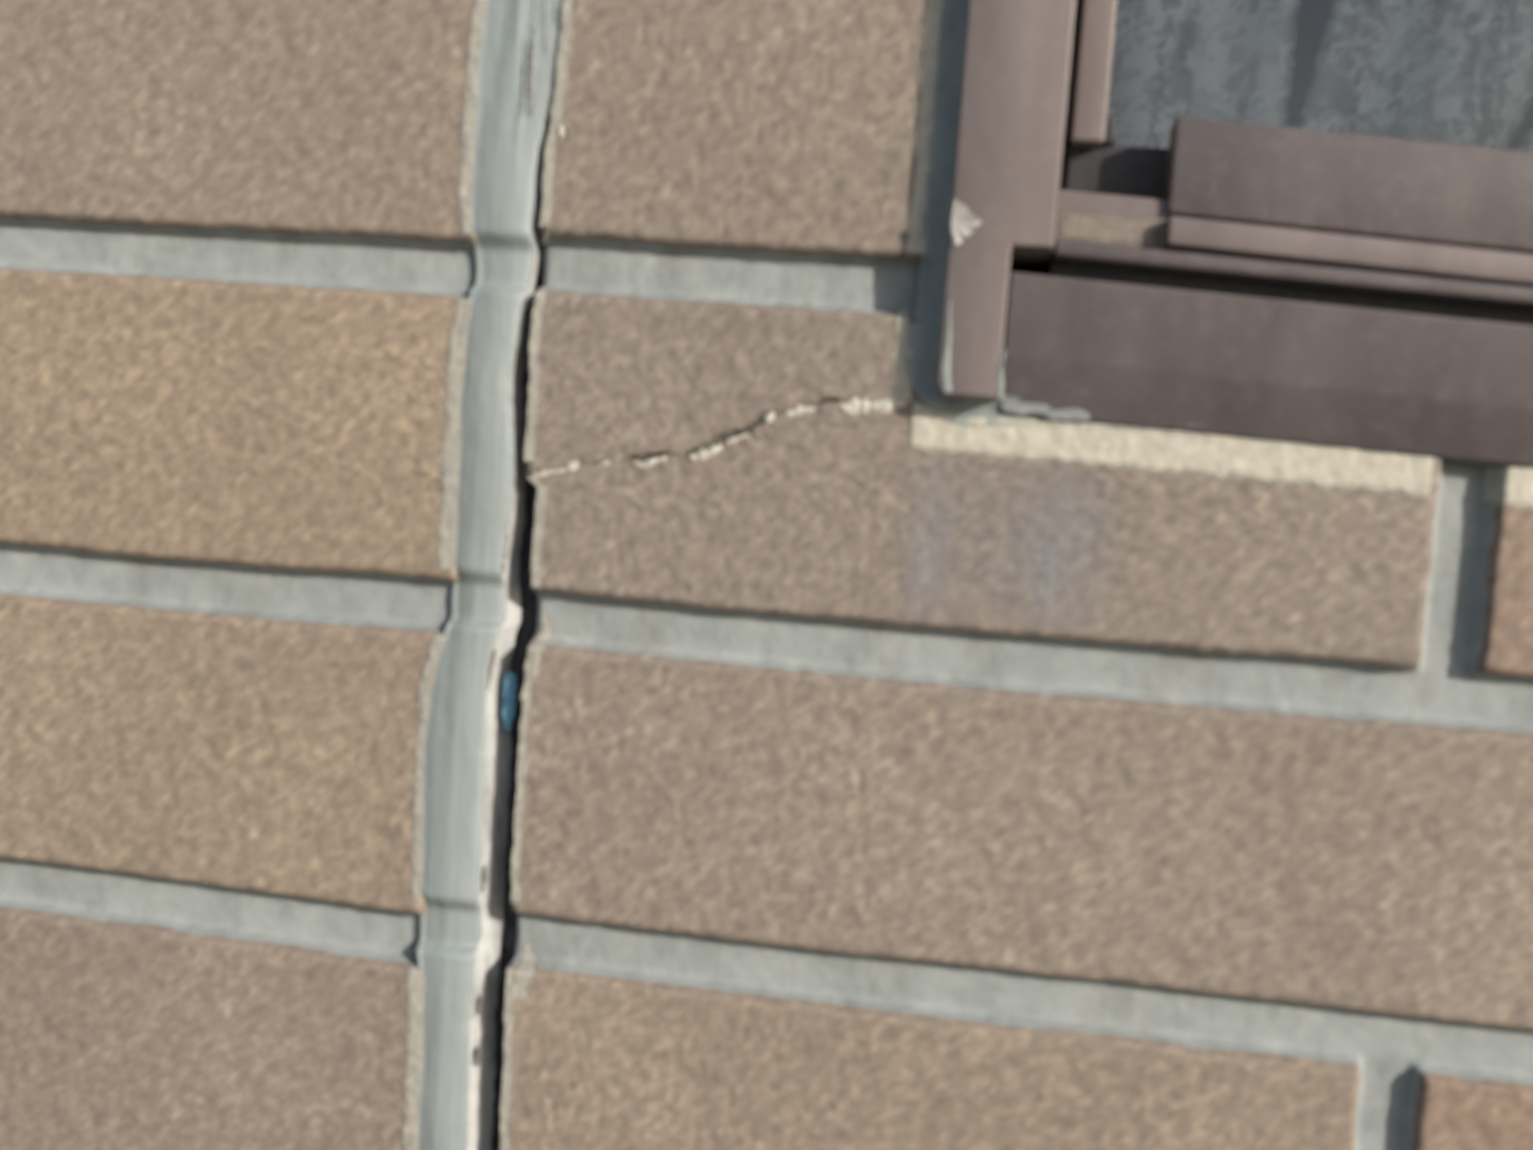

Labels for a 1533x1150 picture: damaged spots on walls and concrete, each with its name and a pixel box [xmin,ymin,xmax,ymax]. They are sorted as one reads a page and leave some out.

crack [525,395,907,477]